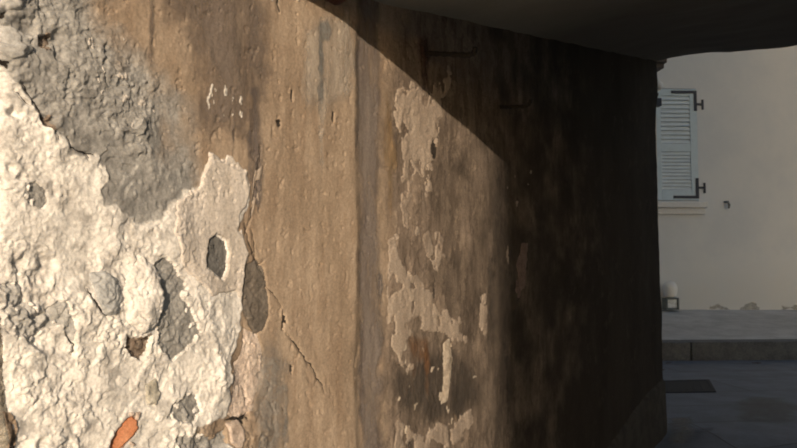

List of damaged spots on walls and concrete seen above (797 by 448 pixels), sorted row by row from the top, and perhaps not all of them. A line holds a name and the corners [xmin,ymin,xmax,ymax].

spalling [38,32,51,50]
spalling [39,114,58,131]
peeling [207,83,243,118]
spalling [24,182,47,208]
peeling [393,65,452,272]
crack [244,150,282,307]
spalling [0,283,77,342]
peeling [125,152,268,448]
crack [288,334,324,391]
peeling [386,234,474,448]
peeling [2,411,18,448]
flaking render [110,412,141,448]